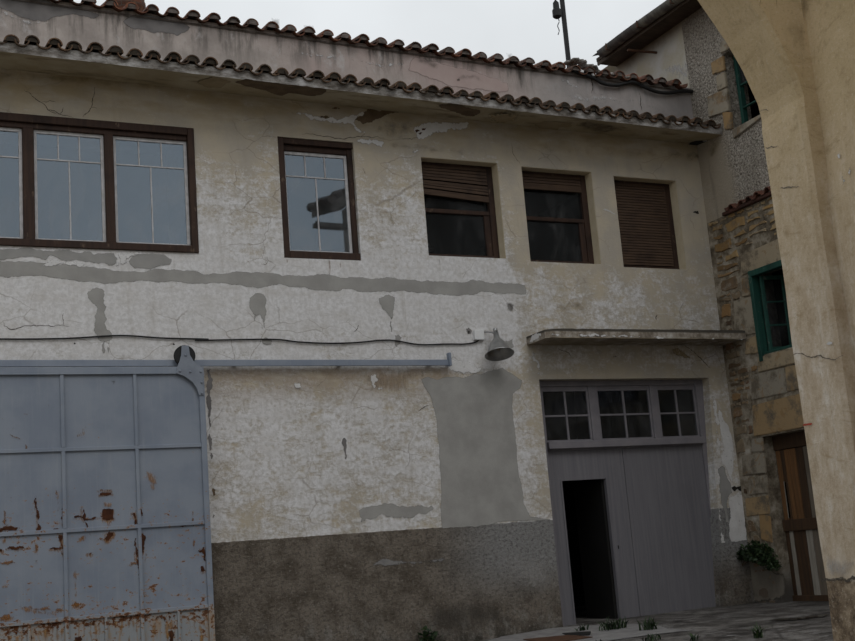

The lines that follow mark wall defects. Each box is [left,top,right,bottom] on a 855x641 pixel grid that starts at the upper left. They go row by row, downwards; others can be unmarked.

flaking render [0,0,99,21]
flaking render [124,15,190,36]
spalling [296,107,395,147]
peeling [413,103,480,153]
peeling [43,259,83,267]
peeling [116,251,139,266]
crack [792,352,841,360]
rust [74,489,115,543]
rust [0,511,24,565]
rust [131,534,146,576]
rust [0,614,63,641]
rust [152,615,175,641]